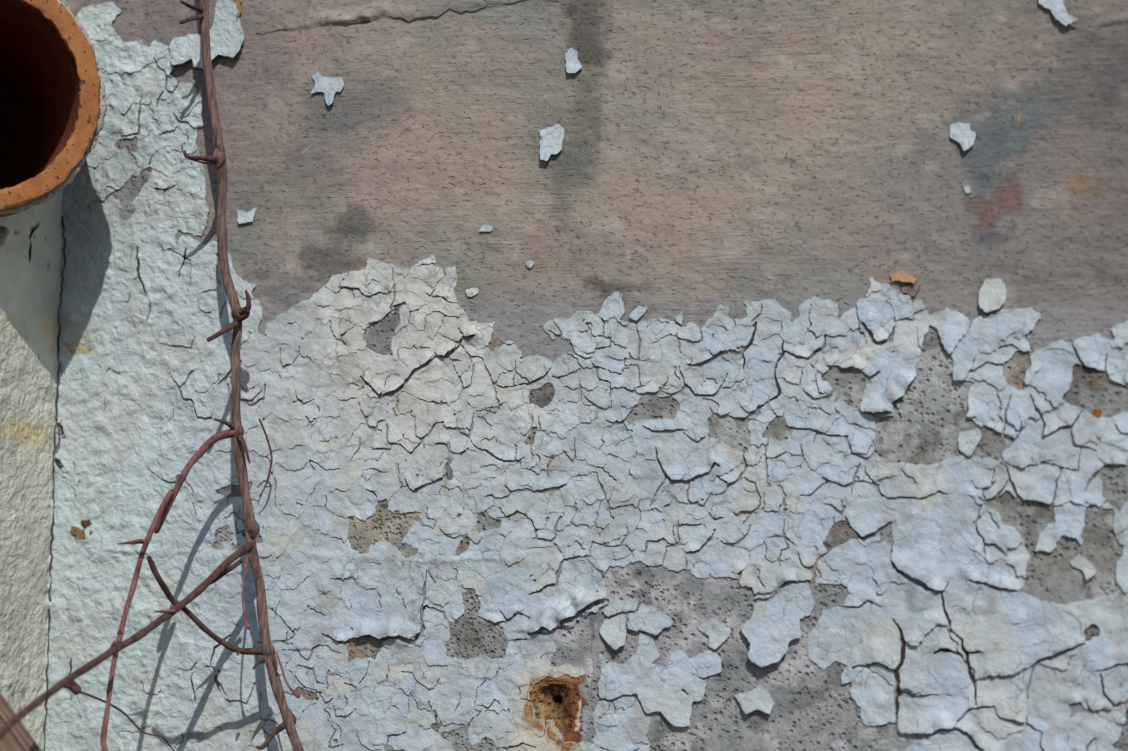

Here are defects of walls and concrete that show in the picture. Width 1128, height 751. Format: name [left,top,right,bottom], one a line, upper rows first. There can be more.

peeling [1039,0,1079,26]
peeling [565,48,582,73]
peeling [539,124,564,161]
peeling [950,122,976,151]
peeling [44,0,293,751]
crack [742,321,757,369]
crack [766,342,785,404]
crack [28,216,74,751]
peeling [228,252,1128,751]
crack [892,618,906,715]
crack [934,591,982,704]
rust [524,674,586,751]